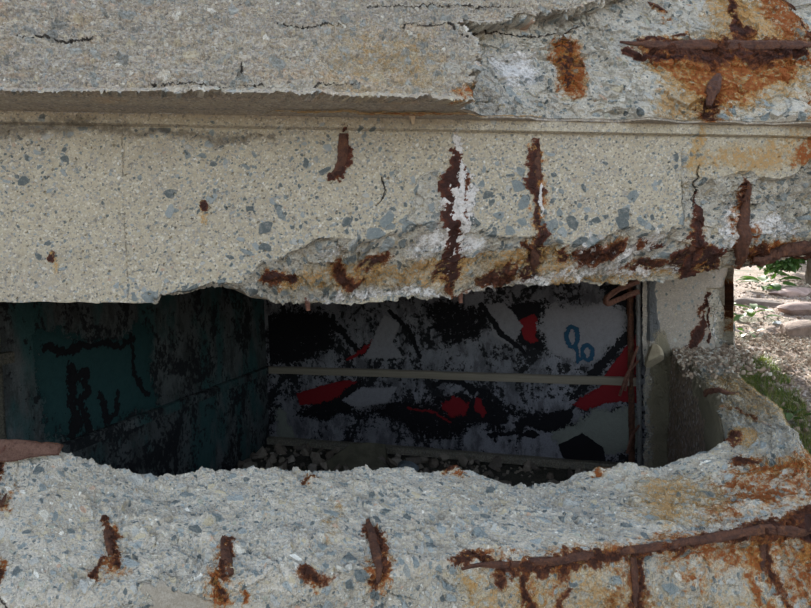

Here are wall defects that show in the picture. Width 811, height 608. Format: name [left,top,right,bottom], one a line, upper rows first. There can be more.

crack [17,34,97,44]
crack [367,2,586,38]
rust [547,34,589,100]
spalling [460,0,811,123]
rust [720,0,758,40]
spalling [327,125,354,183]
spalling [151,151,811,307]
rust [431,134,728,299]
rust [258,268,297,293]
rust [329,250,391,293]
spalling [702,287,734,347]
rust [636,404,811,528]